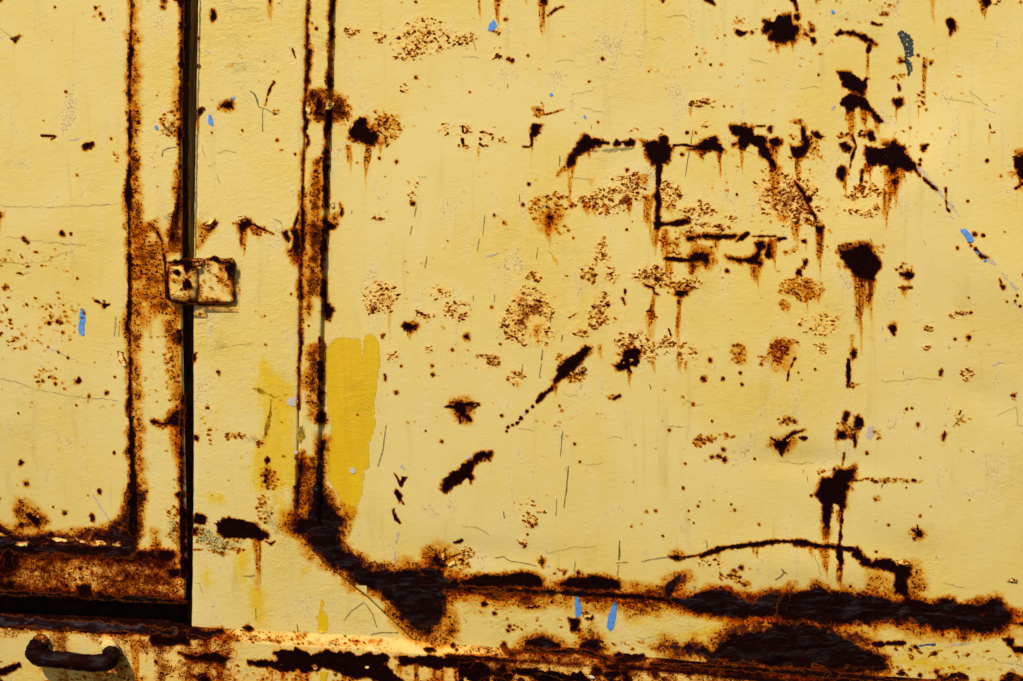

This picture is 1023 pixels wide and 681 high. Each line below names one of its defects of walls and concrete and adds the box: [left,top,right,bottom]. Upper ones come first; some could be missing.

corrosion [945,17,958,36]
corrosion [232,0,402,425]
corrosion [521,0,954,388]
corrosion [17,230,72,275]
corrosion [0,283,41,350]
corrosion [23,292,85,341]
corrosion [917,310,974,354]
corrosion [500,344,593,432]
corrosion [392,465,407,524]
corrosion [440,450,493,494]
corrosion [511,496,547,550]
corrosion [910,514,924,541]